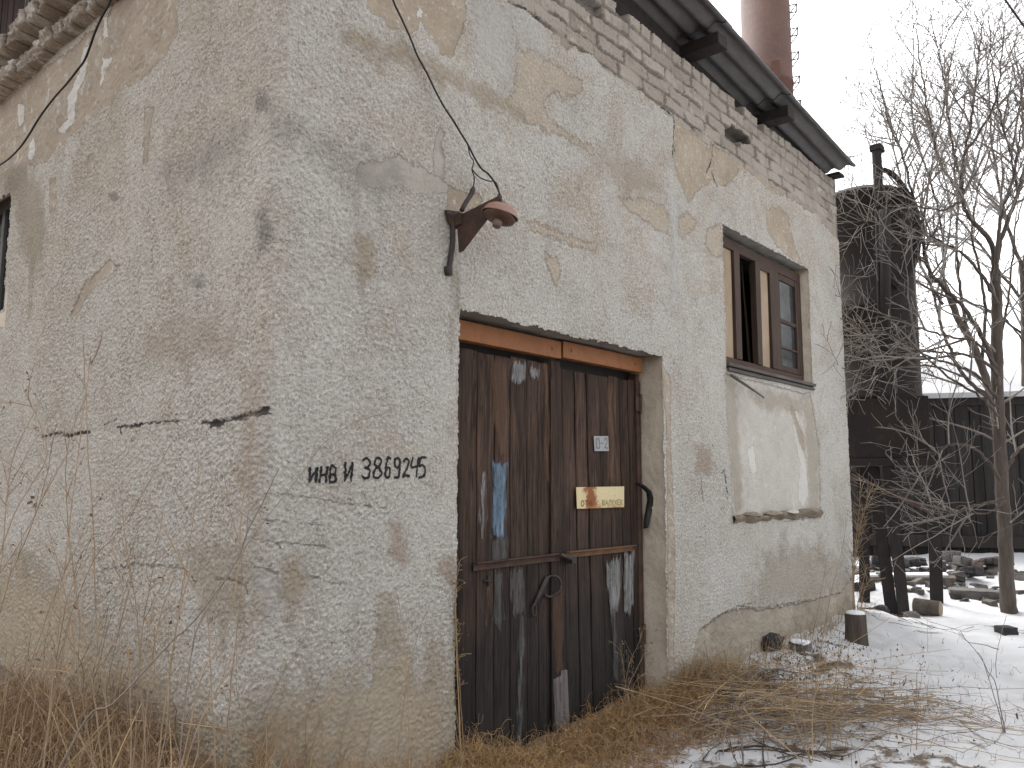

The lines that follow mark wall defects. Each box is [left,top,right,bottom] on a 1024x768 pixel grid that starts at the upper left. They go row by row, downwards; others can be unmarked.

peeling [0,0,180,185]
peeling [367,0,467,57]
peeling [618,119,802,264]
crack [41,406,271,438]
peeling [725,373,821,523]